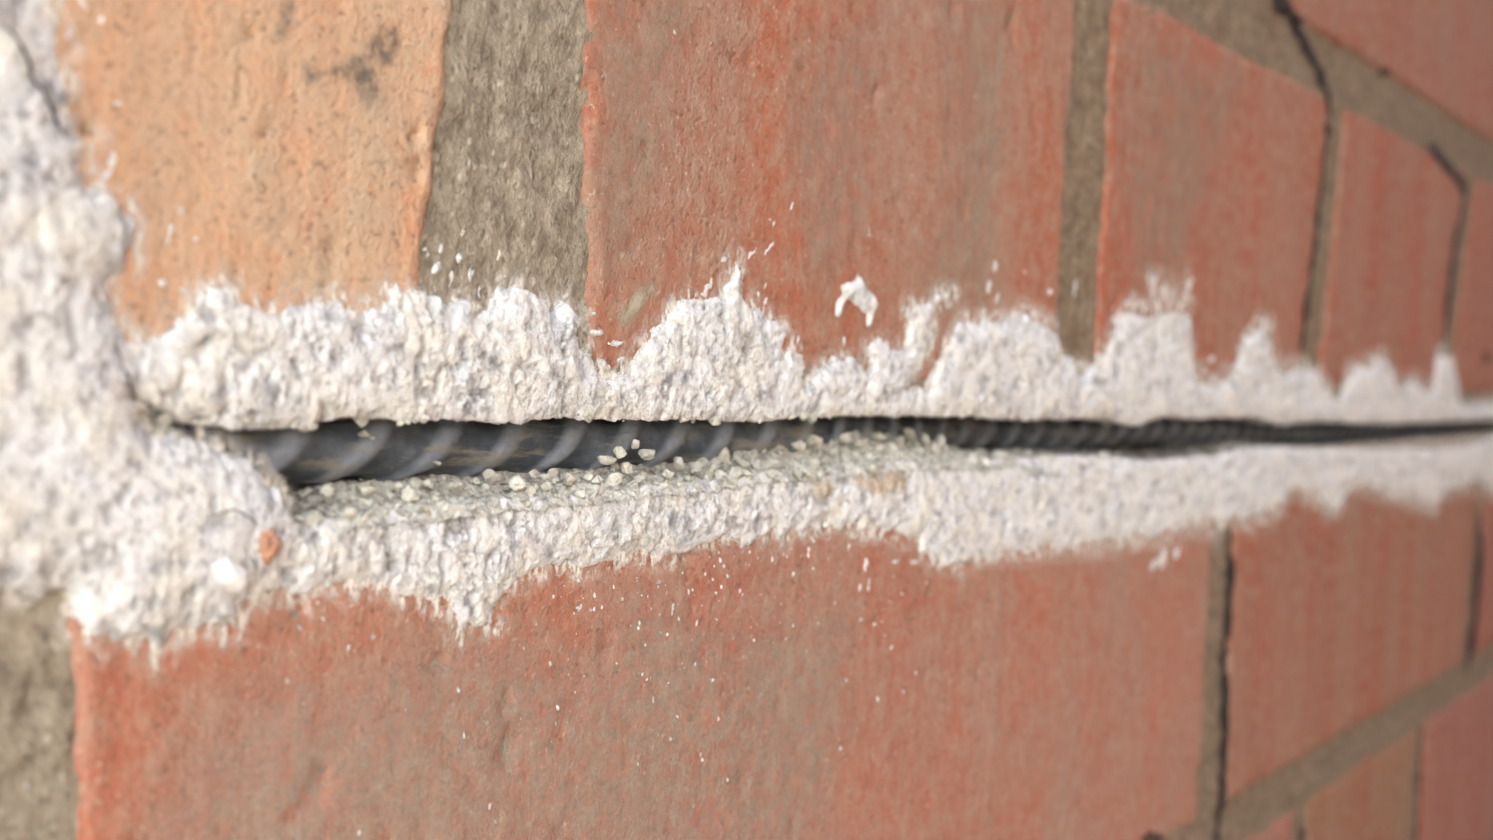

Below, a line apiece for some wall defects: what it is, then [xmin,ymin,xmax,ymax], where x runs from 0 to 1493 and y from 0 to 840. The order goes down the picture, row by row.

crack [1273,0,1332,358]
crack [1428,142,1468,345]
crack [1214,529,1235,840]